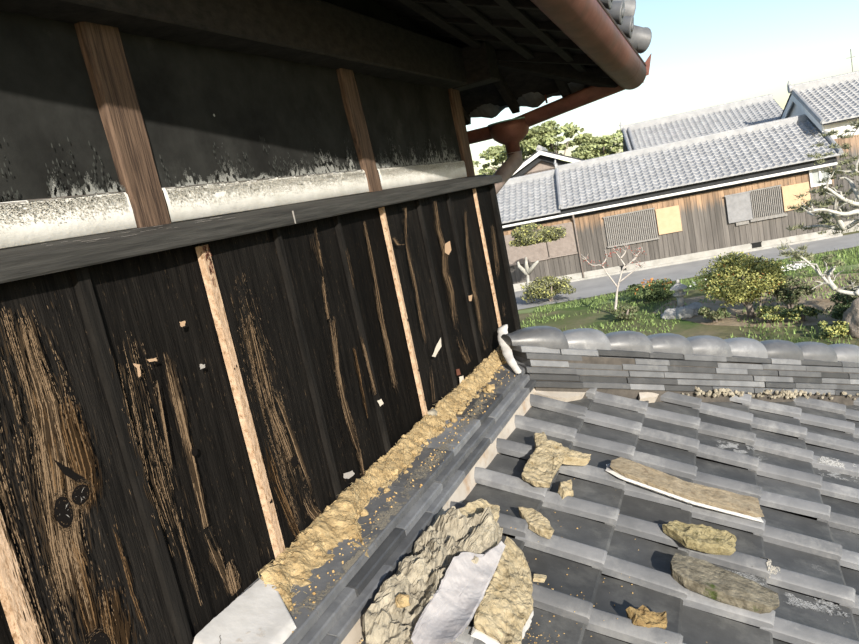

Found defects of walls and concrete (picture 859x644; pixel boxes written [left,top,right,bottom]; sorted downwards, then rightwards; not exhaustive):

damp [0,137,129,233]
damp [159,135,367,208]
damp [377,137,465,181]